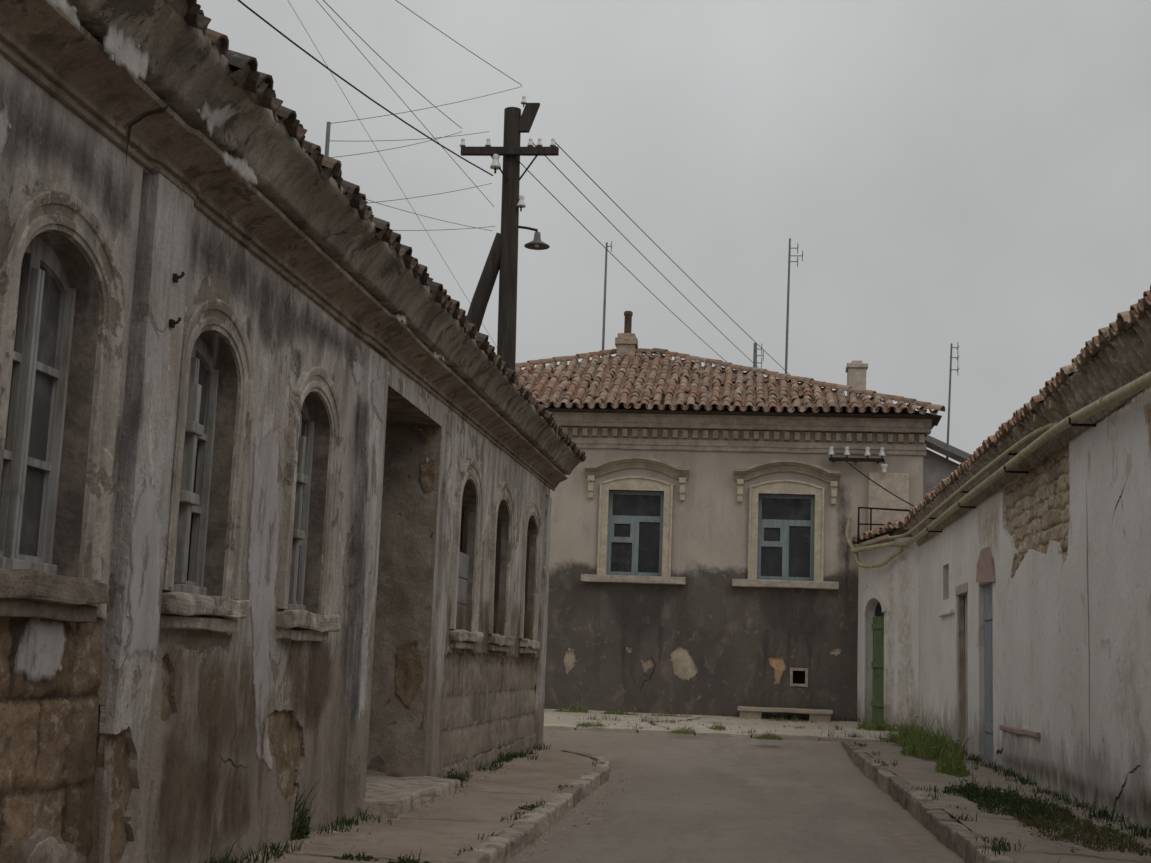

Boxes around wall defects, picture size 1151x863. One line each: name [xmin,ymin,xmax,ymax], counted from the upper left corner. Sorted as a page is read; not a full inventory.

water stain [194,235,353,360]
spalling [1005,443,1070,576]
spalling [670,646,698,680]
spalling [768,656,787,684]
spalling [0,617,133,863]